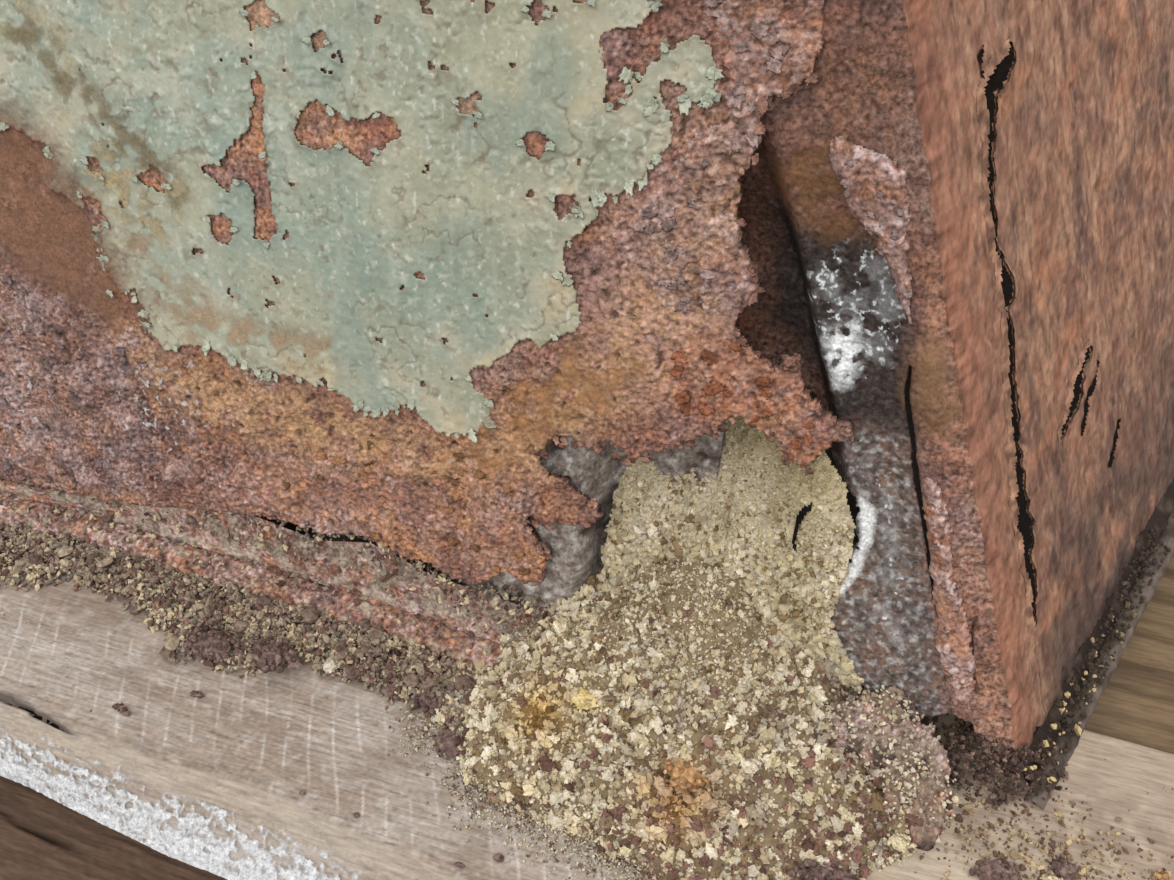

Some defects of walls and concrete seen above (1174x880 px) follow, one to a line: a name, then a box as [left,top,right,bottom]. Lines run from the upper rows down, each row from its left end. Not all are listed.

rust [0,0,184,322]
peeling [203,70,278,249]
peeling [292,100,401,166]
peeling [546,153,662,220]
peeling [676,66,724,116]
rust [632,196,716,313]
rust [670,352,815,467]
damp [809,256,902,387]
crack [904,366,934,590]
crack [976,35,1039,635]
crack [1057,339,1100,444]
crack [1108,418,1121,468]